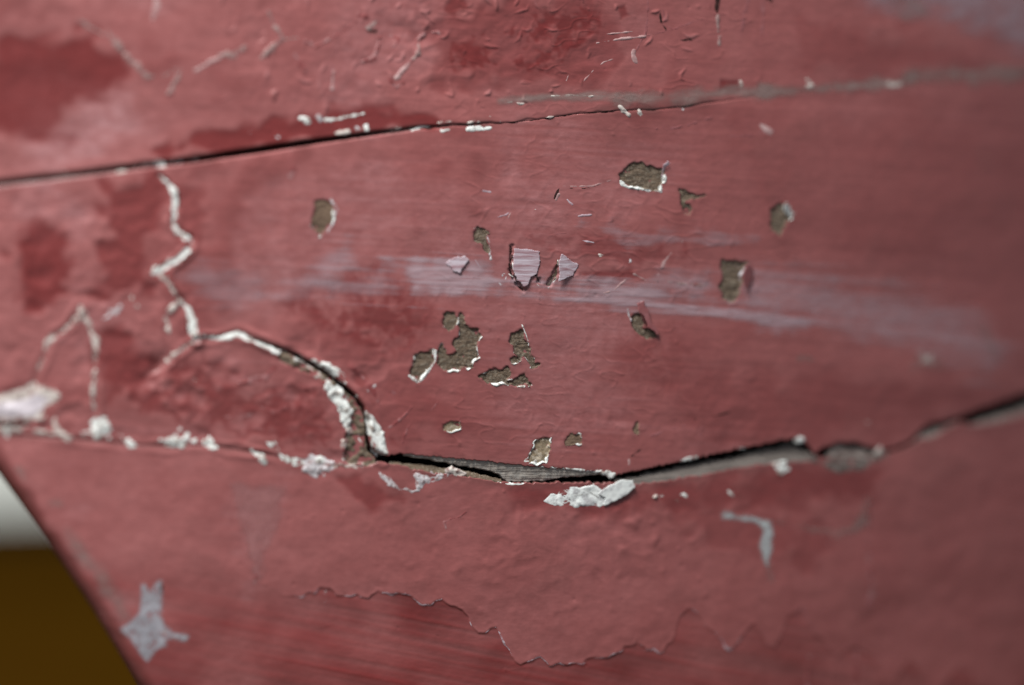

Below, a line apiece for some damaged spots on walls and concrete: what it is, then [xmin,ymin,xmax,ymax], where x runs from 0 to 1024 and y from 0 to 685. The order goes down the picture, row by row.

peeling [619,161,670,193]
peeling [311,199,338,238]
peeling [770,202,795,236]
crack [0,104,888,485]
peeling [445,226,492,273]
peeling [499,245,578,291]
peeling [719,259,753,303]
peeling [627,301,659,339]
peeling [408,312,540,387]
crack [913,394,1024,443]
peeling [524,437,552,466]
peeling [544,480,635,508]